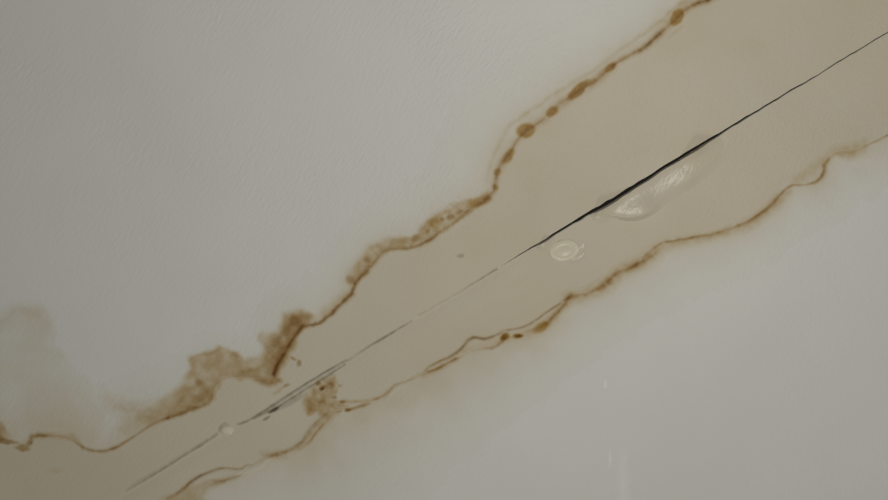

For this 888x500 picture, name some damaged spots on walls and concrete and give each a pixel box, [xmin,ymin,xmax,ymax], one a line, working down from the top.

damp [0,300,109,447]
damp [0,420,142,455]
crack [125,266,506,493]
damp [94,0,678,448]
damp [117,159,888,500]
damp [300,33,888,418]
damp [484,0,723,199]
crack [522,34,884,253]